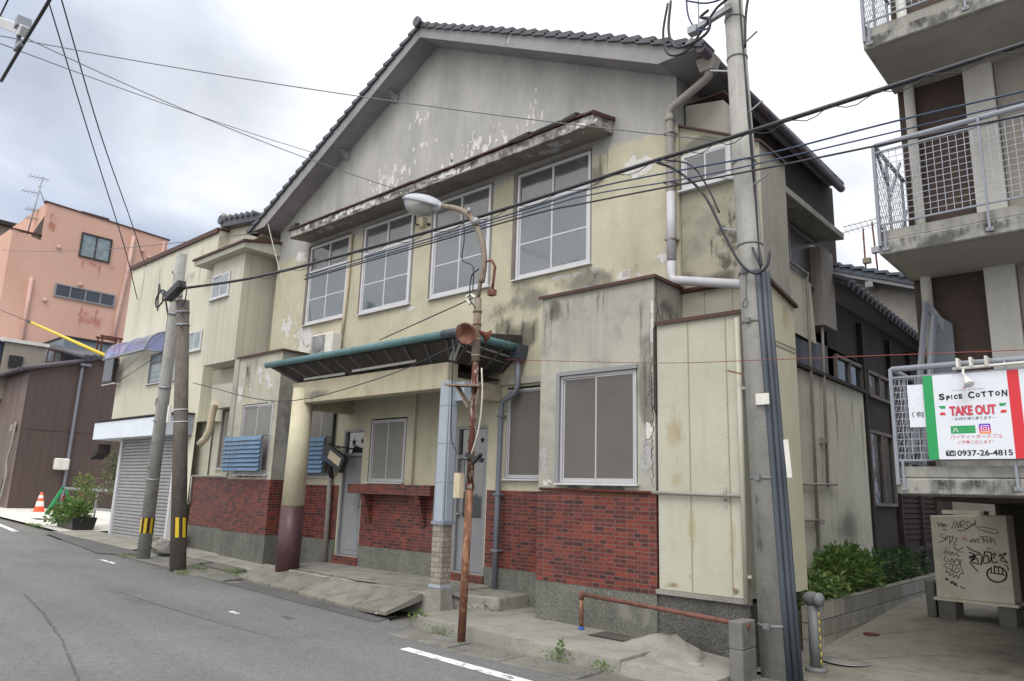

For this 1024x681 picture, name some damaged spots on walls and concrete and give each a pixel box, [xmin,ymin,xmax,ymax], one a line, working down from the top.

peeling [305,87,543,230]
peeling [624,153,654,181]
peeling [280,312,316,353]
peeling [238,366,273,404]
crack [639,282,662,484]
crack [23,593,80,681]